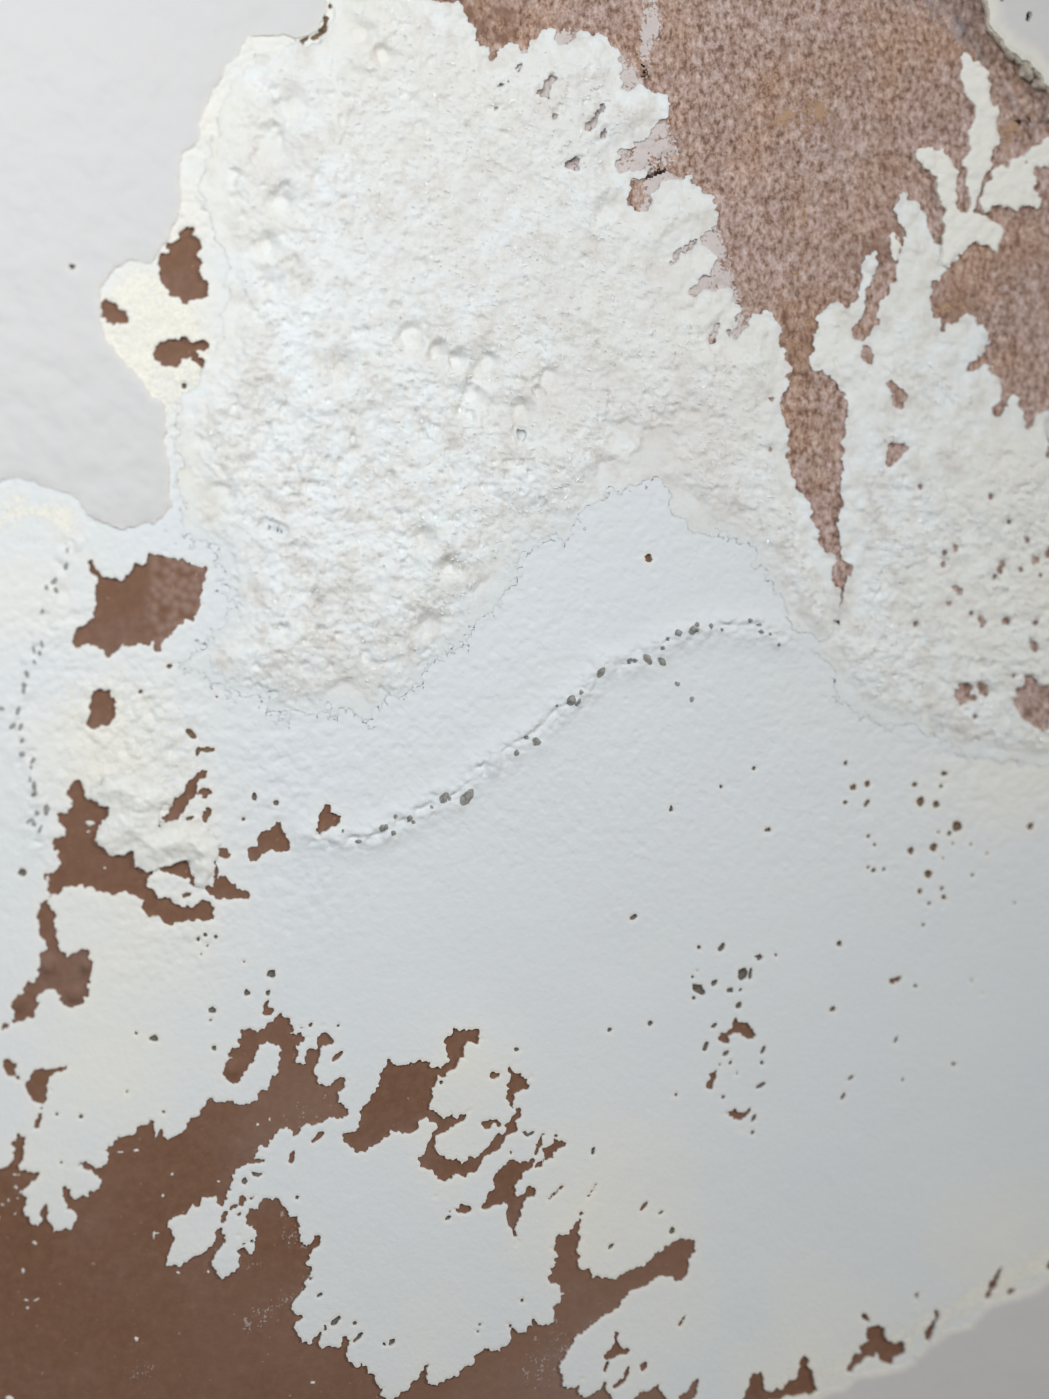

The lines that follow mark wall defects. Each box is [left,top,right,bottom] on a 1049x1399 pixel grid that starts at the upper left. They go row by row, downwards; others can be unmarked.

peeling [153,337,209,368]
peeling [157,227,209,304]
spalling [432,0,1049,605]
peeling [72,553,208,658]
peeling [86,688,116,729]
peeling [158,770,207,828]
peeling [44,779,214,925]
peeling [11,900,93,1023]
peeling [0,1013,386,1399]
peeling [394,1218,699,1399]
peeling [743,1356,816,1399]
peeling [847,1325,905,1371]